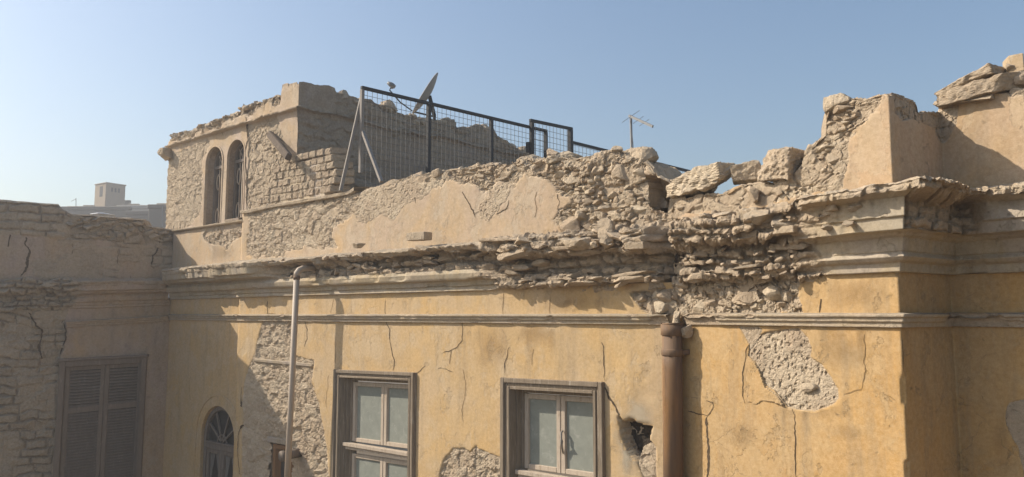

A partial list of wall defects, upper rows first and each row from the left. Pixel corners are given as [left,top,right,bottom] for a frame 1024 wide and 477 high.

spalling [165,139,210,232]
spalling [204,93,958,259]
crack [8,235,31,275]
spalling [0,292,68,477]
crack [29,313,67,359]
spalling [242,321,329,477]
crack [385,312,466,419]
spalling [441,446,500,477]
crack [601,342,619,416]
spalling [630,421,657,477]
crack [689,398,713,476]
spalling [740,326,839,411]